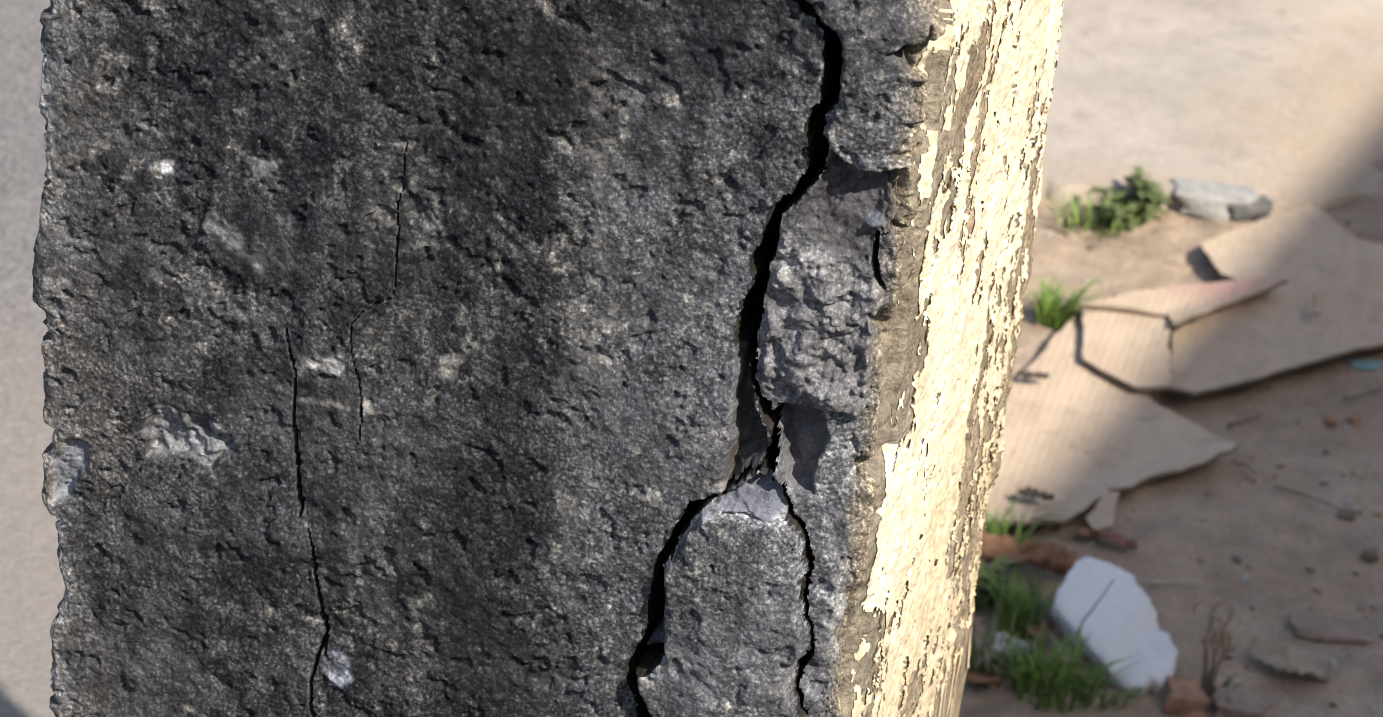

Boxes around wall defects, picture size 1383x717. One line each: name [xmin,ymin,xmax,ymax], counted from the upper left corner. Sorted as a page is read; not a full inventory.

crack [625,0,843,717]
peeling [701,0,1064,717]
crack [875,198,909,290]